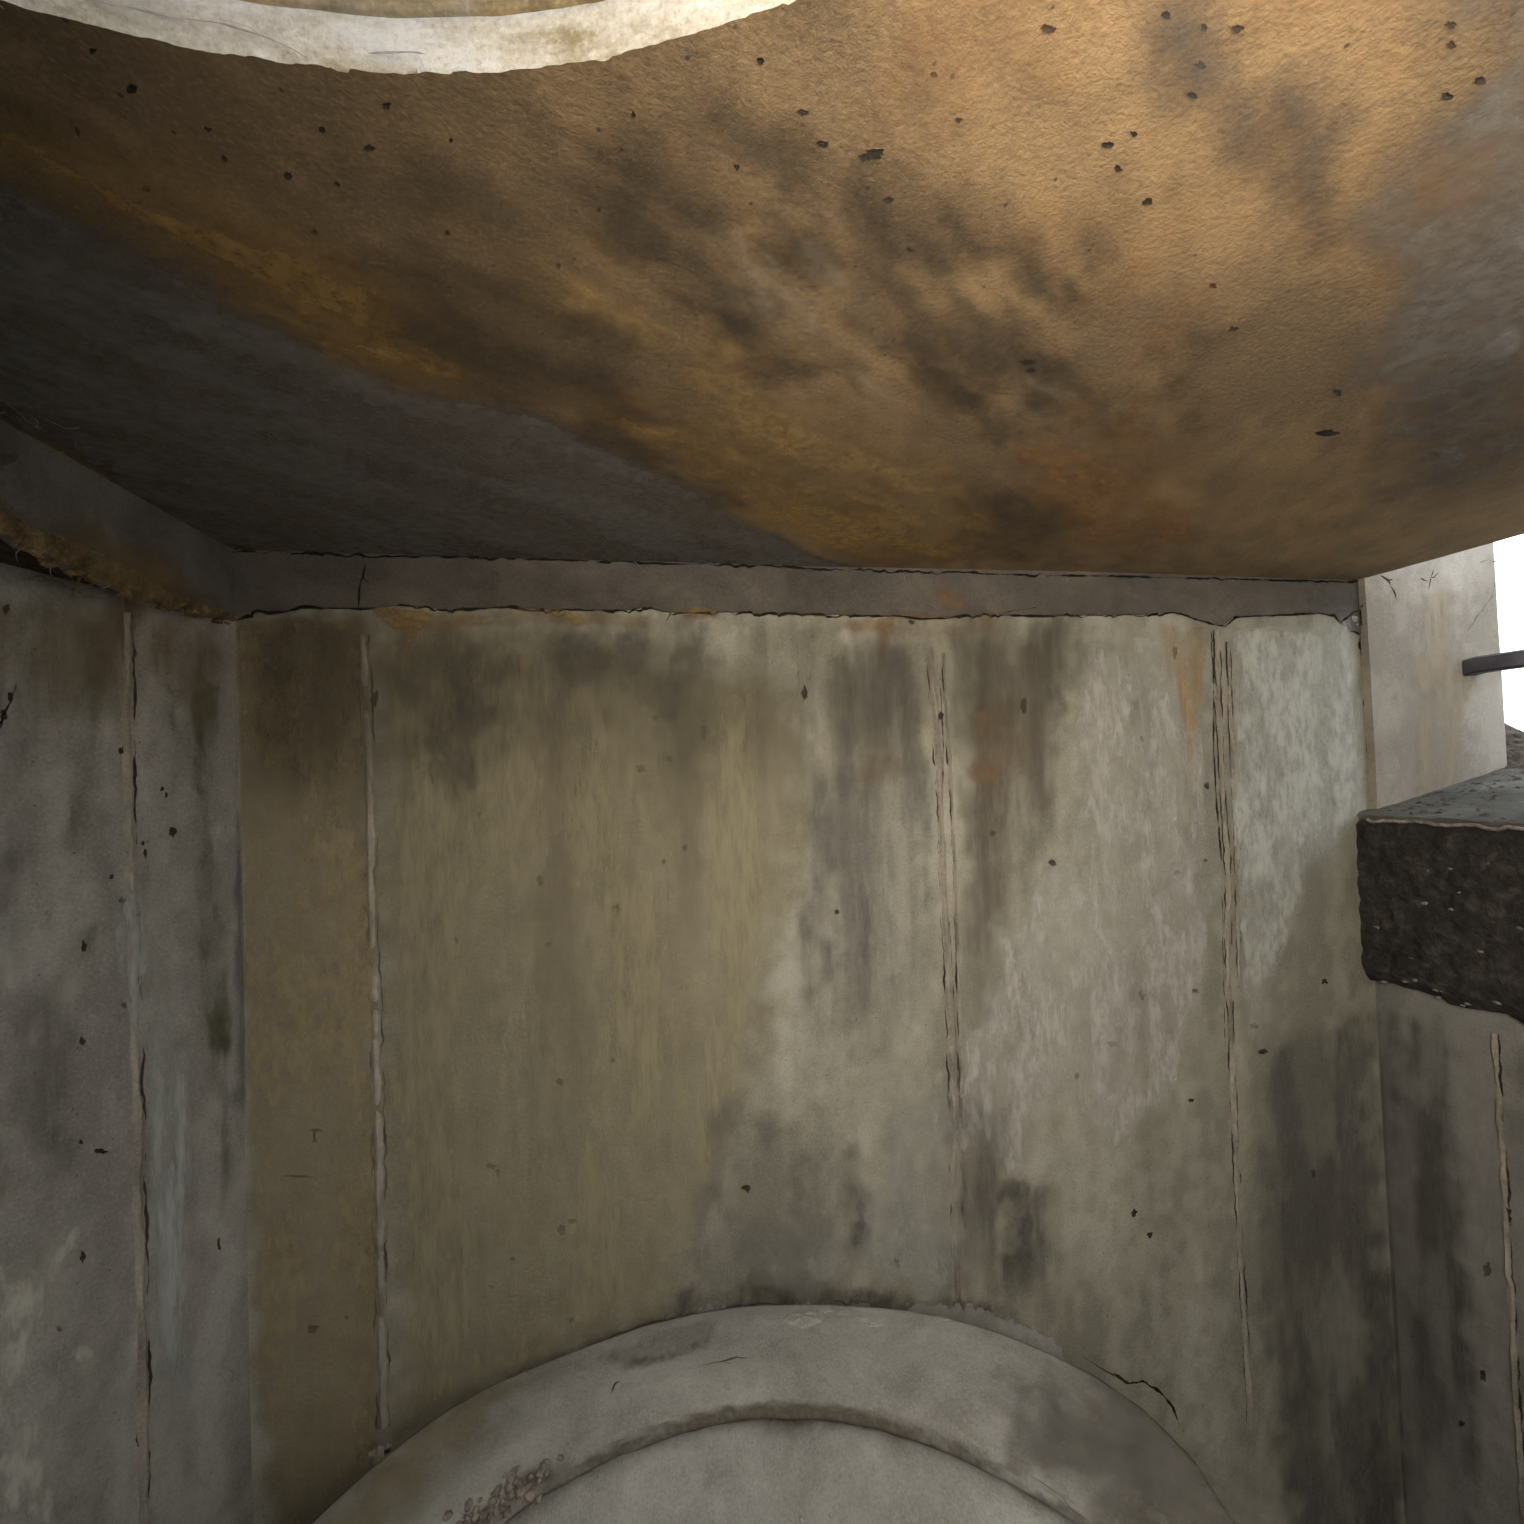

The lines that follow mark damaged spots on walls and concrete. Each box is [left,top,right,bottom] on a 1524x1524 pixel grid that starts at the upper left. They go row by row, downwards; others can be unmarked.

spalling [0,508,238,625]
crack [0,683,17,748]
water stain [384,628,791,1408]
water stain [153,1063,189,1359]
water stain [777,1278,904,1310]
water stain [1275,1034,1403,1524]
water stain [1414,1102,1468,1397]
water stain [1031,1380,1276,1524]